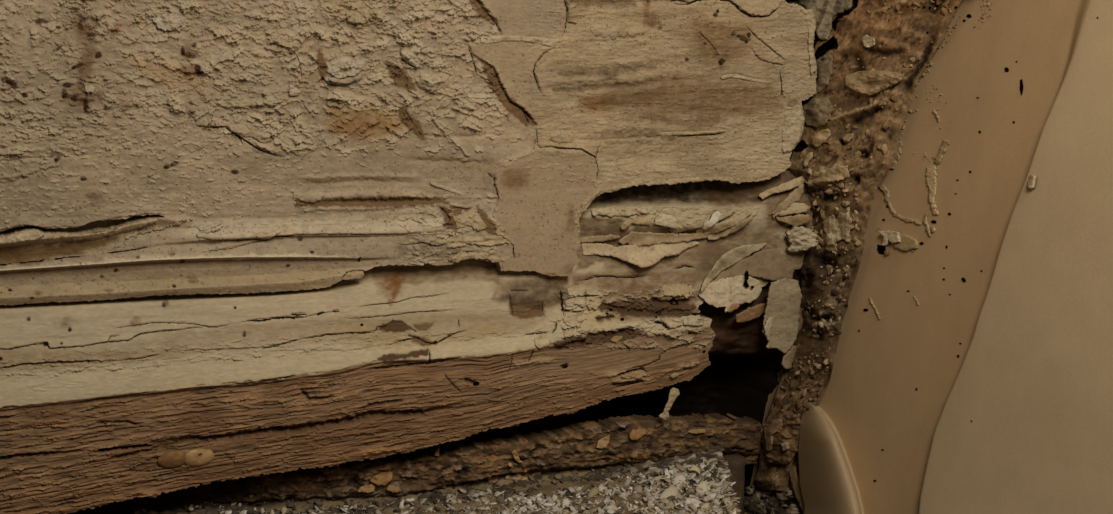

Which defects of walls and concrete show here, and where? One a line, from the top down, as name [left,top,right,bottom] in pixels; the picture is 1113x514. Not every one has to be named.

spalling [484,63,536,126]
crack [471,0,602,176]
crack [671,0,785,98]
peeling [735,0,817,75]
spalling [832,1,856,29]
spalling [862,35,875,48]
peeling [758,98,854,256]
crack [0,247,148,265]
crack [2,293,464,393]
crack [199,206,472,255]
crack [508,275,648,372]
peeling [534,208,802,369]